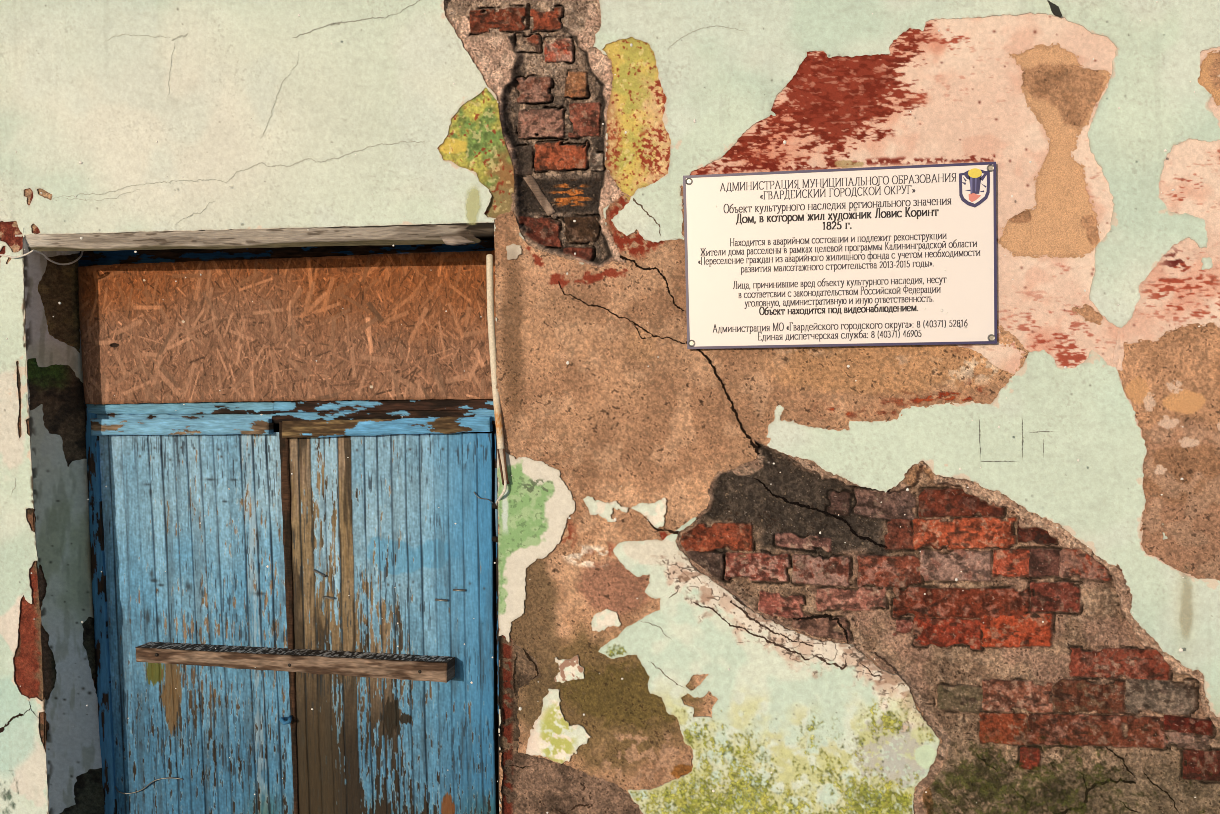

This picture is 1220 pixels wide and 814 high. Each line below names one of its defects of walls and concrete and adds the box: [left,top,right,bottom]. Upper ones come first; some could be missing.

peeling [24,188,52,205]
peeling [0,221,40,264]
peeling [38,253,80,353]
crack [620,255,684,311]
peeling [17,358,87,467]
crack [558,281,887,549]
peeling [438,0,1220,814]
peeling [27,508,36,532]
peeling [14,561,57,750]
peeling [82,617,96,689]
crack [0,698,35,733]
peeling [59,768,105,814]